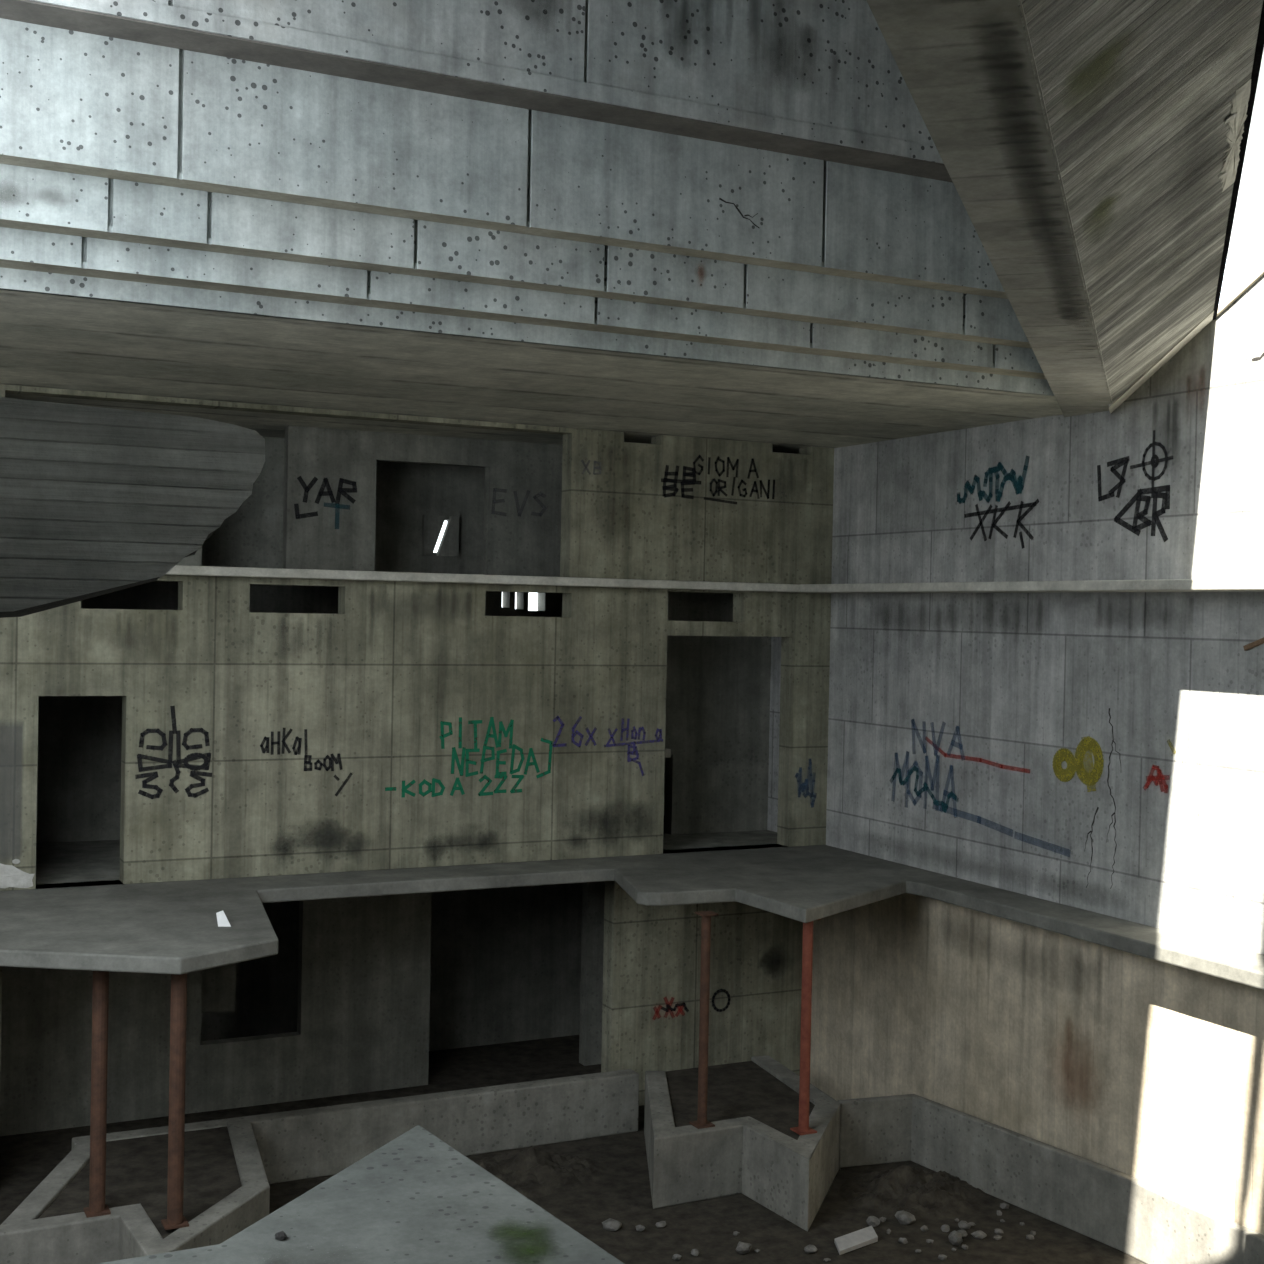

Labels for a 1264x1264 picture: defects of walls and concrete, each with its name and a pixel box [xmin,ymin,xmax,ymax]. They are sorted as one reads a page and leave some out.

peeling [0,859,34,888]